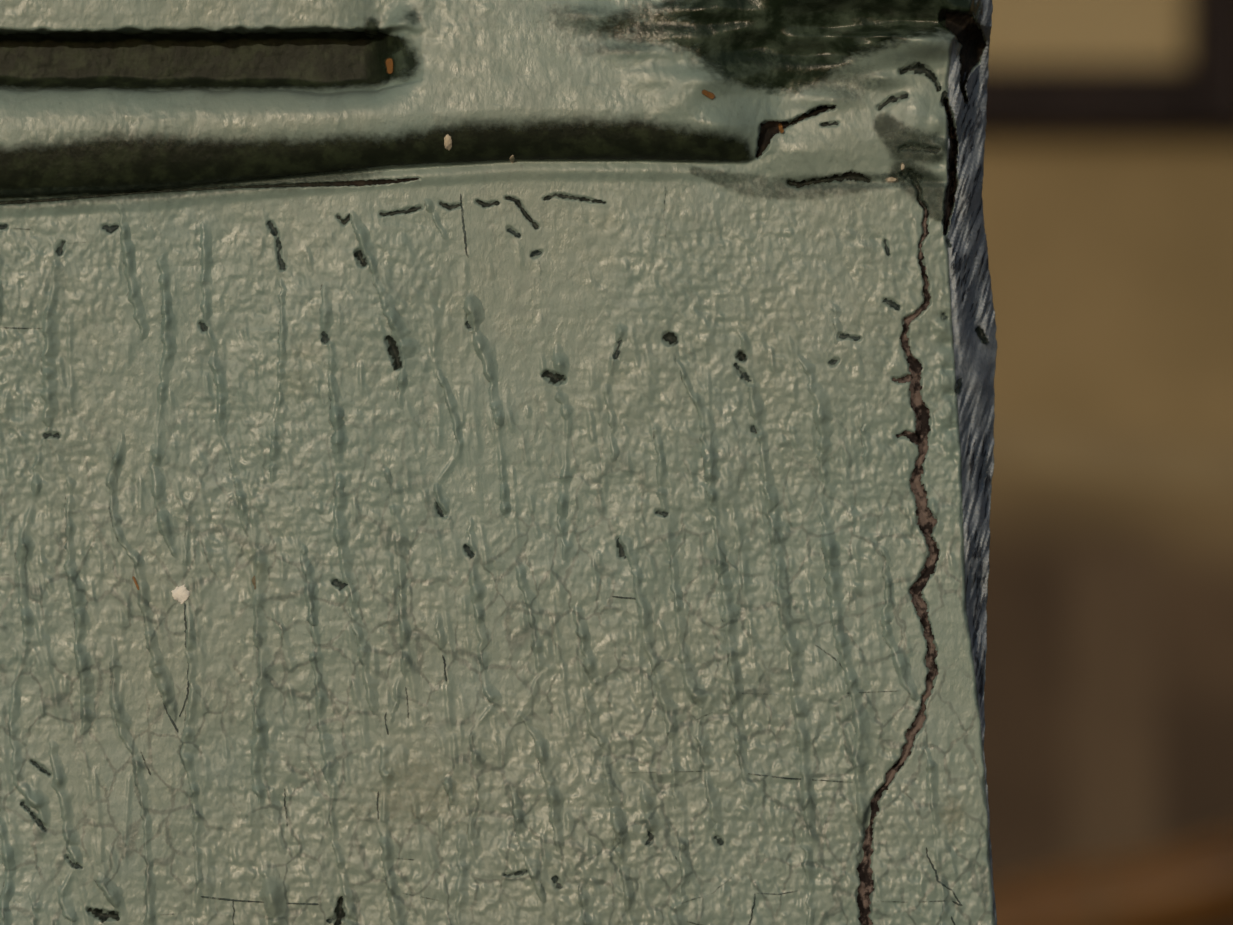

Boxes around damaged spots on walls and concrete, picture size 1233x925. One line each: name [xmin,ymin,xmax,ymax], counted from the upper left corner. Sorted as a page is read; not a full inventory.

peeling [337,209,422,410]
peeling [476,196,539,238]
crack [756,105,836,158]
crack [787,171,871,188]
peeling [900,0,997,744]
peeling [663,332,753,786]
crack [847,105,963,925]
peeling [57,476,157,925]
peeling [106,433,205,889]
crack [163,603,189,733]
crack [748,773,842,782]
crack [201,896,319,923]